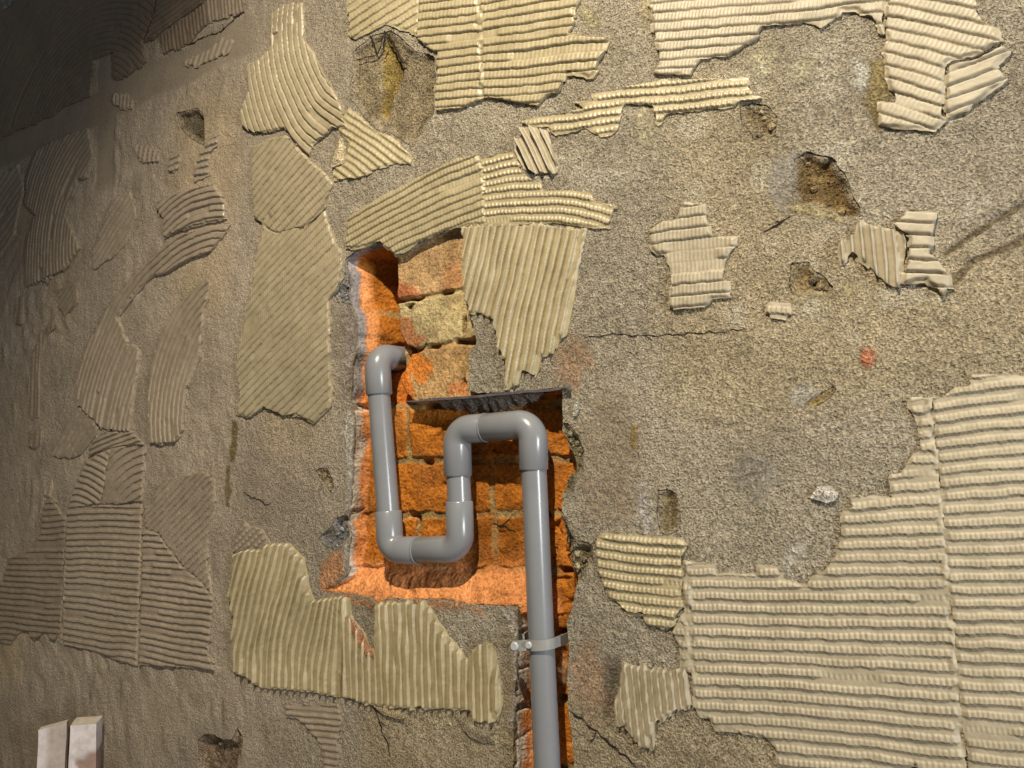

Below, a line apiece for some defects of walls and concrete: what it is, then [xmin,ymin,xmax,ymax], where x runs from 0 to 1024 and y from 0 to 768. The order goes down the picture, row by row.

spalling [350,31,436,147]
spalling [335,249,362,306]
crack [586,329,743,339]
spalling [562,402,584,499]
spalling [319,515,352,551]
spalling [562,512,594,584]